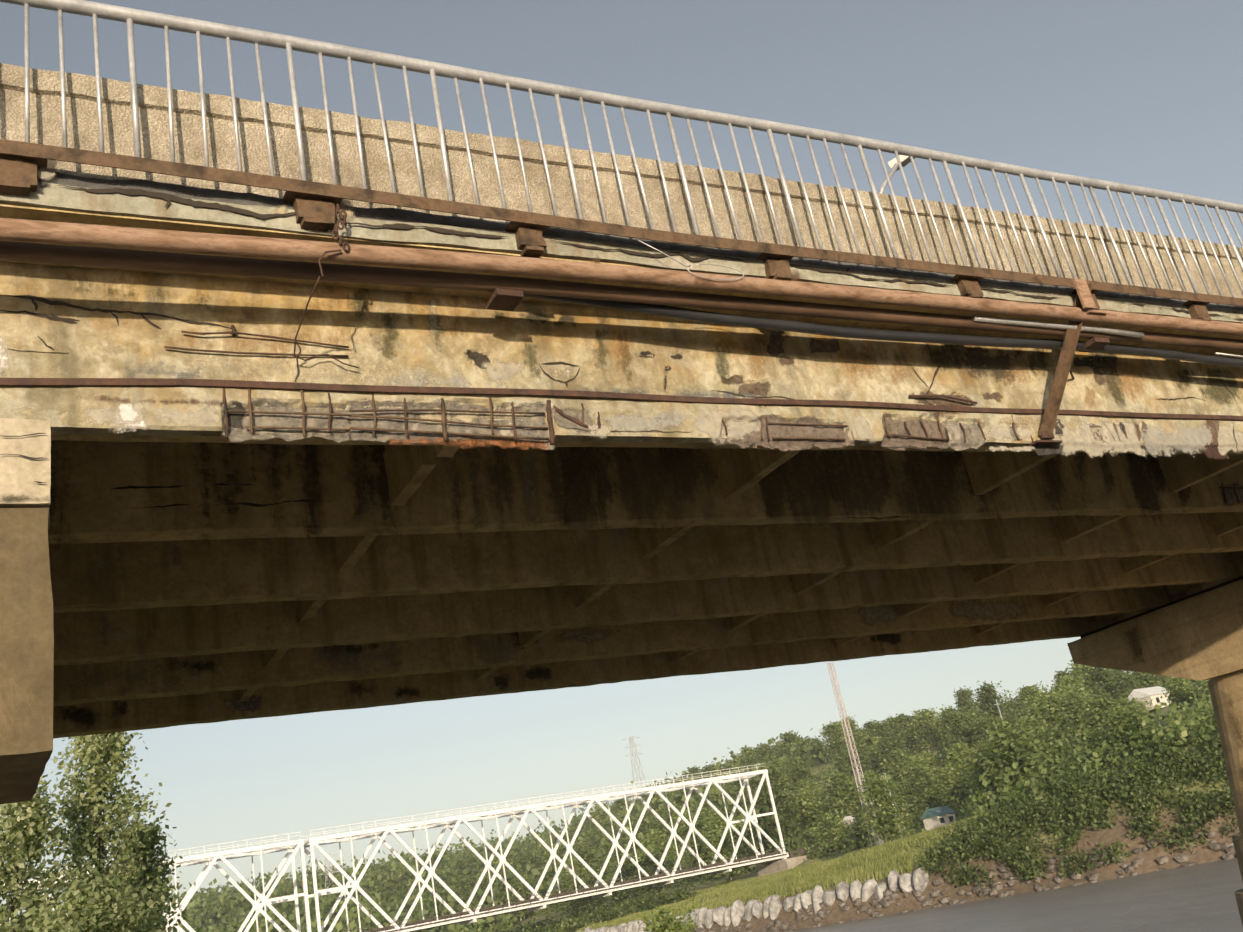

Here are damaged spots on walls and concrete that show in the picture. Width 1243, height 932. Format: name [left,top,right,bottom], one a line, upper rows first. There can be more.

crack [58,185,296,220]
crack [1,295,232,353]
crack [294,341,302,382]
spalling [86,325,1243,456]
leakage [926,343,1049,380]
leakage [1087,352,1125,402]
leakage [1177,369,1238,404]
crack [110,483,327,508]
leakage [351,445,396,532]
leakage [544,447,715,544]
leakage [760,450,1006,538]
leakage [1043,453,1085,511]